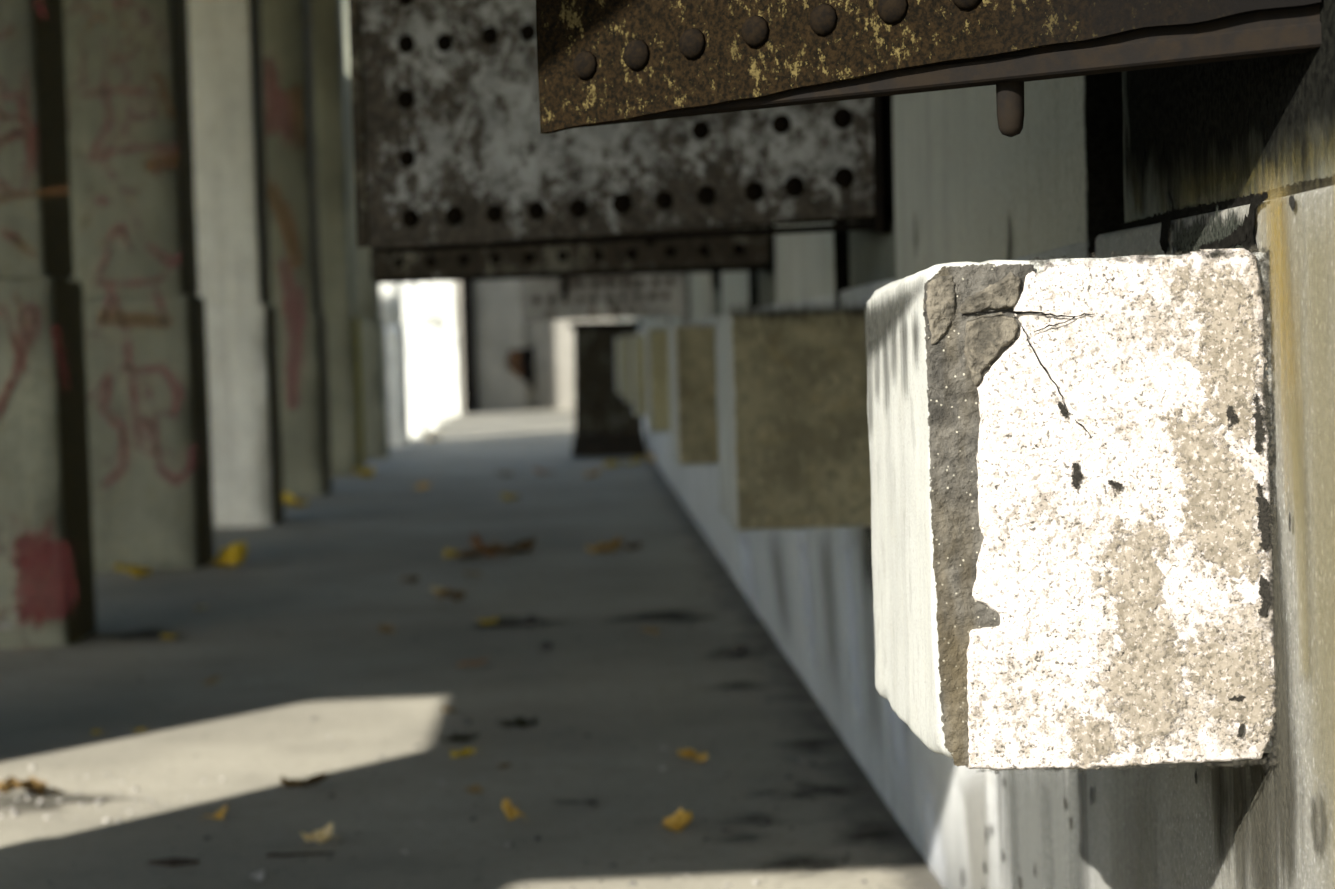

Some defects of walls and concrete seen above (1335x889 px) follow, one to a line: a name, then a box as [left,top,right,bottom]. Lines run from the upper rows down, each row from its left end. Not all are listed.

spalling [923,263,1036,767]
crack [962,310,1093,437]
leakage [1203,510,1291,889]
corrosion [1267,198,1295,479]